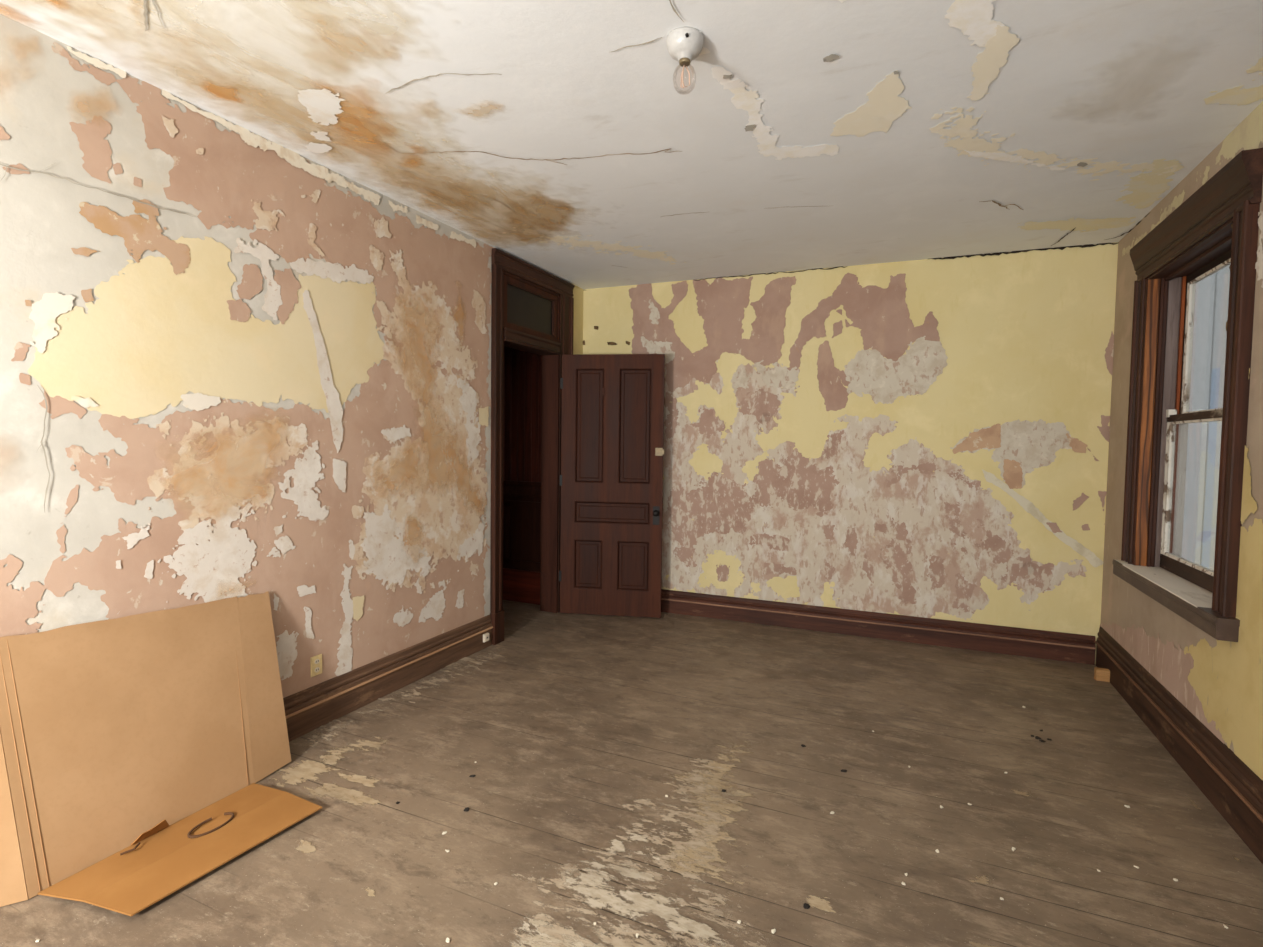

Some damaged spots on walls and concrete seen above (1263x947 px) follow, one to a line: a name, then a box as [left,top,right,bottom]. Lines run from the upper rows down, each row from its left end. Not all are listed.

crack [143,0,165,31]
crack [611,0,684,52]
peeling [945,0,1020,112]
peeling [699,47,912,160]
crack [382,142,676,165]
peeling [1017,57,1263,256]
crack [0,163,194,217]
peeling [573,286,598,355]
peeling [1105,332,1114,375]
peeling [607,273,1099,620]
peeling [1097,415,1110,442]
peeling [1072,491,1107,525]